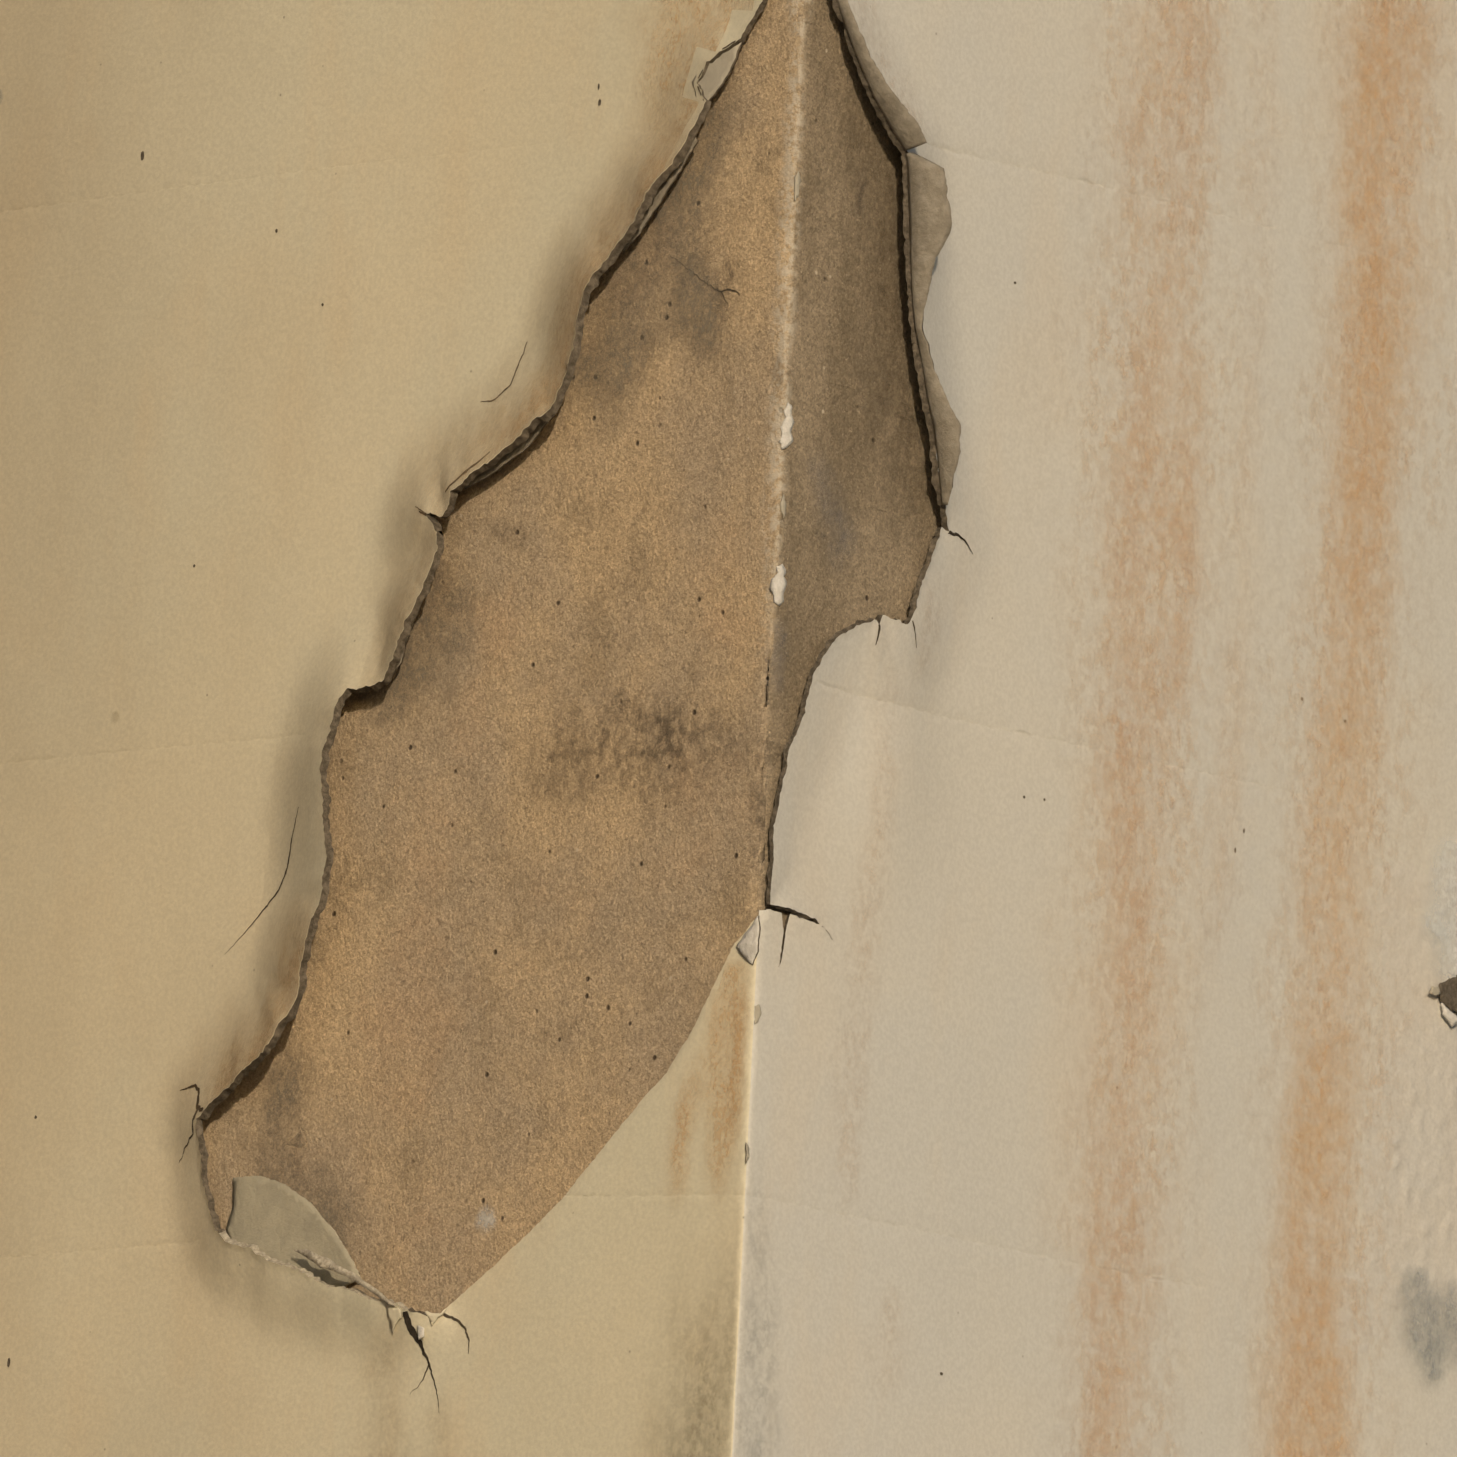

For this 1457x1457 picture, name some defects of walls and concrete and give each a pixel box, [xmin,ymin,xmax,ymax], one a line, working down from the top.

peeling [172,0,984,1363]